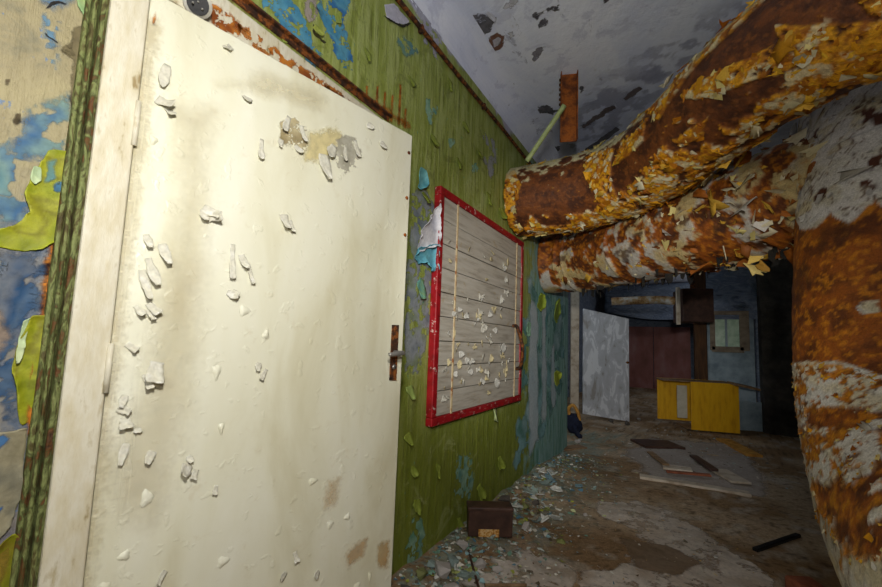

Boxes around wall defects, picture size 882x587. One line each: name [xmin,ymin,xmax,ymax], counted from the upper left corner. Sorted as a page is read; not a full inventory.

peeling [384,4,411,27]
spalling [473,11,496,34]
spalling [61,26,81,102]
peeling [154,63,177,115]
rust [211,4,350,101]
peeling [278,115,309,151]
peeling [327,136,362,173]
peeling [499,0,882,292]
peeling [0,149,66,251]
peeling [138,234,173,320]
peeling [229,244,256,284]
peeling [537,293,561,323]